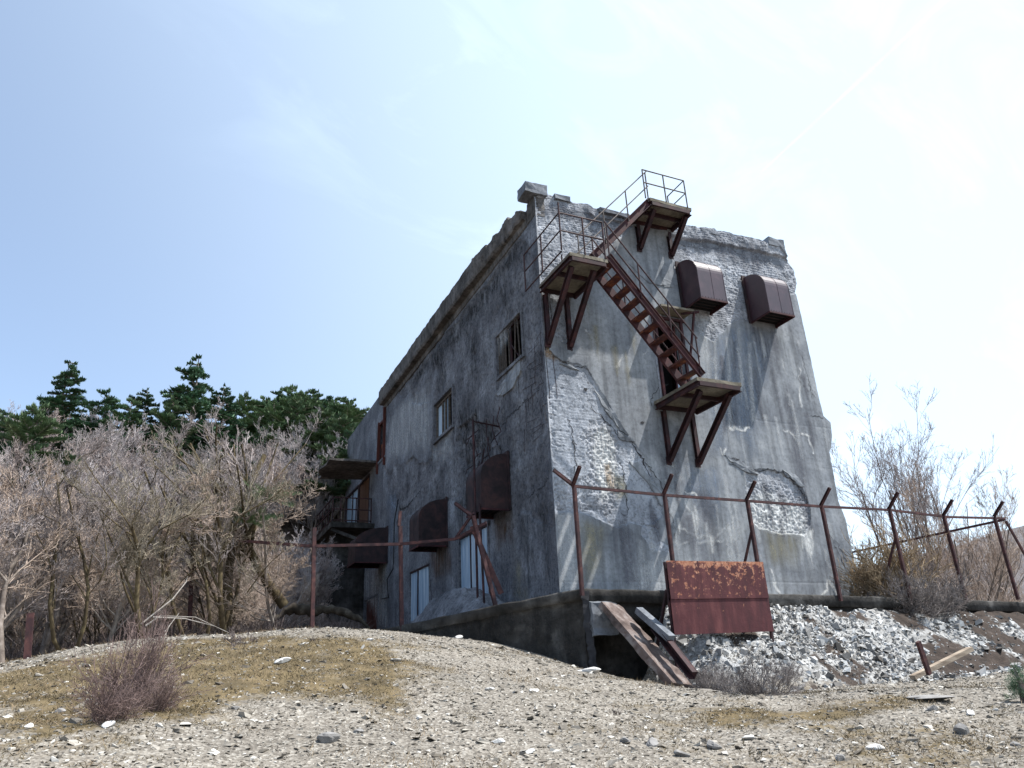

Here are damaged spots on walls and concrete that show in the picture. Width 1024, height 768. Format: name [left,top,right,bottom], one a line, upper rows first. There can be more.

spalling [620,225,797,341]
spalling [384,195,669,552]
crack [587,400,676,537]
spalling [726,455,811,536]